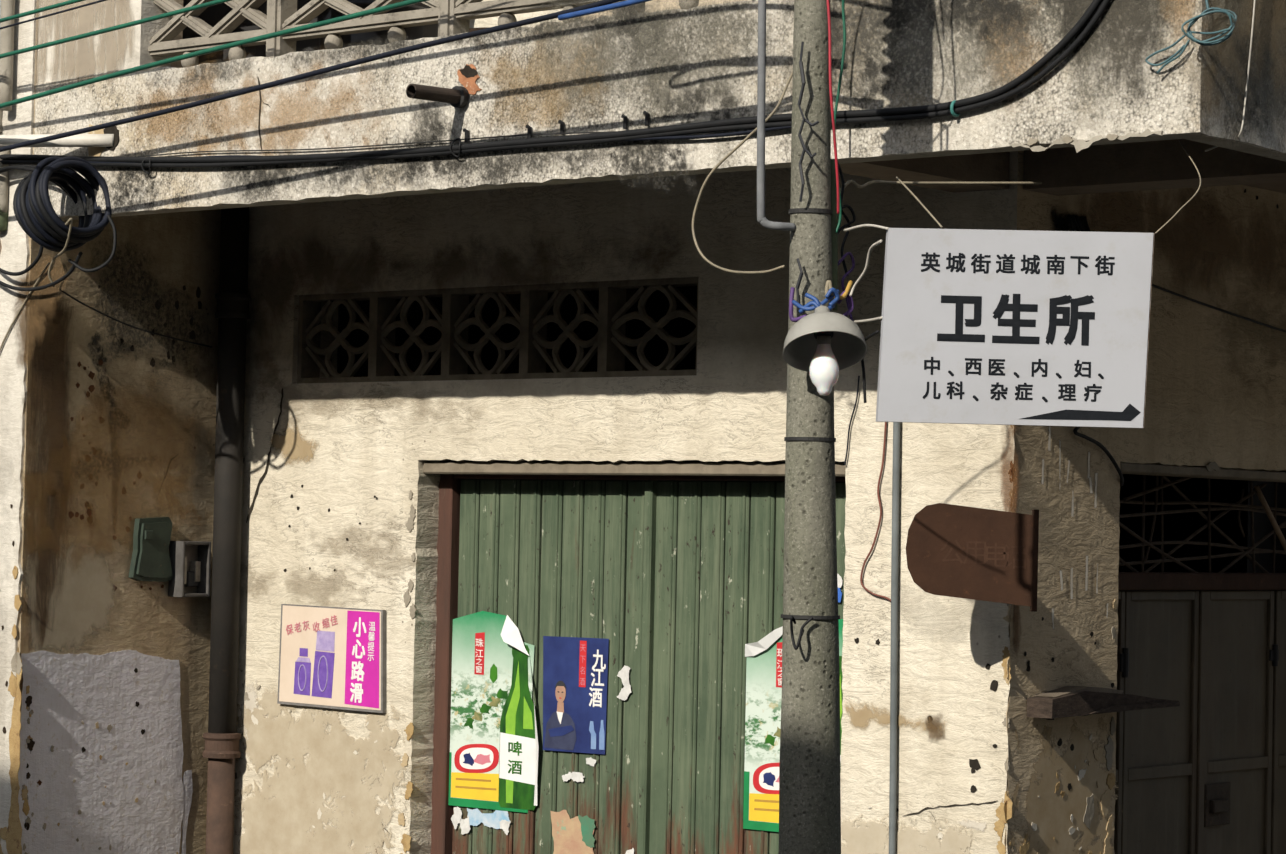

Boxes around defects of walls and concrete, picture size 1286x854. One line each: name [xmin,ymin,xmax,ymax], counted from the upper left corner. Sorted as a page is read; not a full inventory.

leakage [831,0,1032,101]
leakage [1046,0,1171,94]
leakage [89,242,203,525]
leakage [27,297,72,643]
crack [246,387,283,523]
peeling [0,595,60,854]
peeling [841,806,972,854]
spalling [1001,646,1012,685]
peeling [994,716,1118,854]